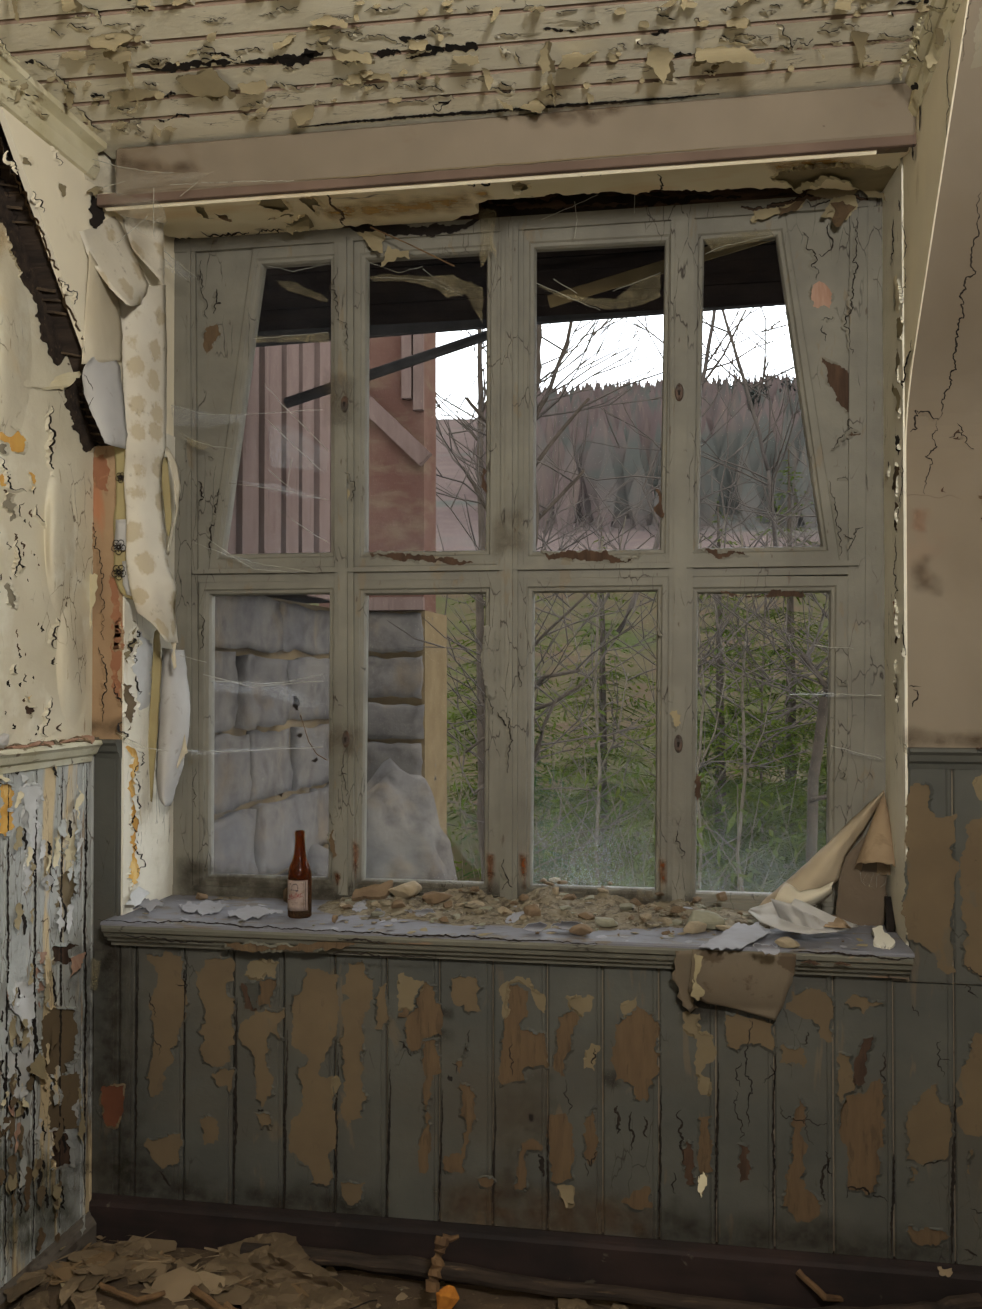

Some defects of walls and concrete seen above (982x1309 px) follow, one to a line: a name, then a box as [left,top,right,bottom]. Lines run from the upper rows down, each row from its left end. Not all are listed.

peeling [0,0,955,137]
peeling [0,412,74,658]
spalling [0,136,113,491]
spalling [347,182,783,267]
crack [741,194,907,354]
peeling [822,357,861,439]
crack [828,419,863,556]
crack [893,194,980,713]
peeling [0,772,126,1253]
peeling [144,941,662,1209]
crack [582,1106,684,1193]
crack [733,1021,888,1202]